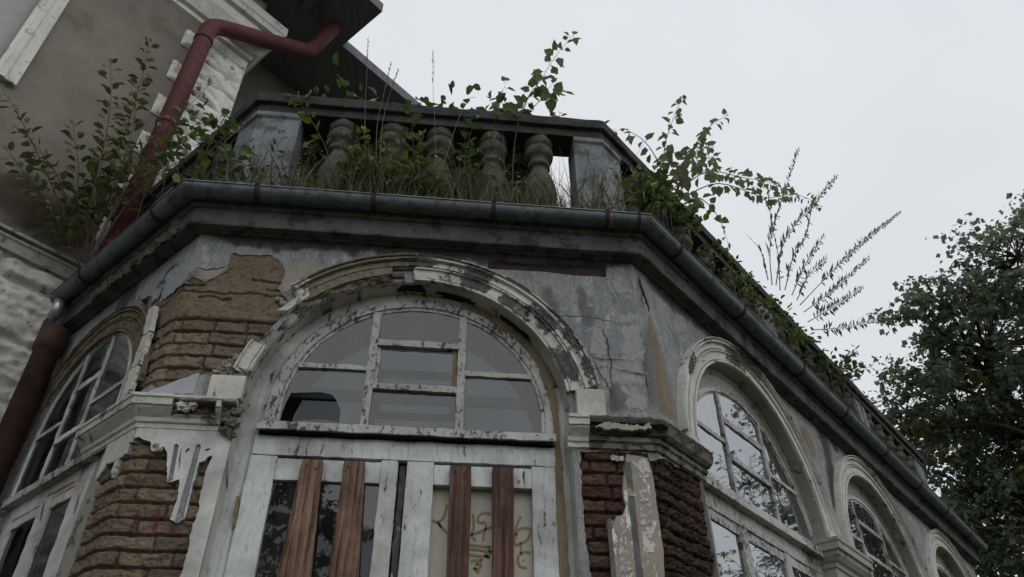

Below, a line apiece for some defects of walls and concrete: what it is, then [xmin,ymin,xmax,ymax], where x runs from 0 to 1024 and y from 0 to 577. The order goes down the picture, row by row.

spalling [120,253,645,577]
crack [563,315,649,399]
crack [638,276,673,333]
spalling [68,439,212,577]
spalling [579,451,714,577]